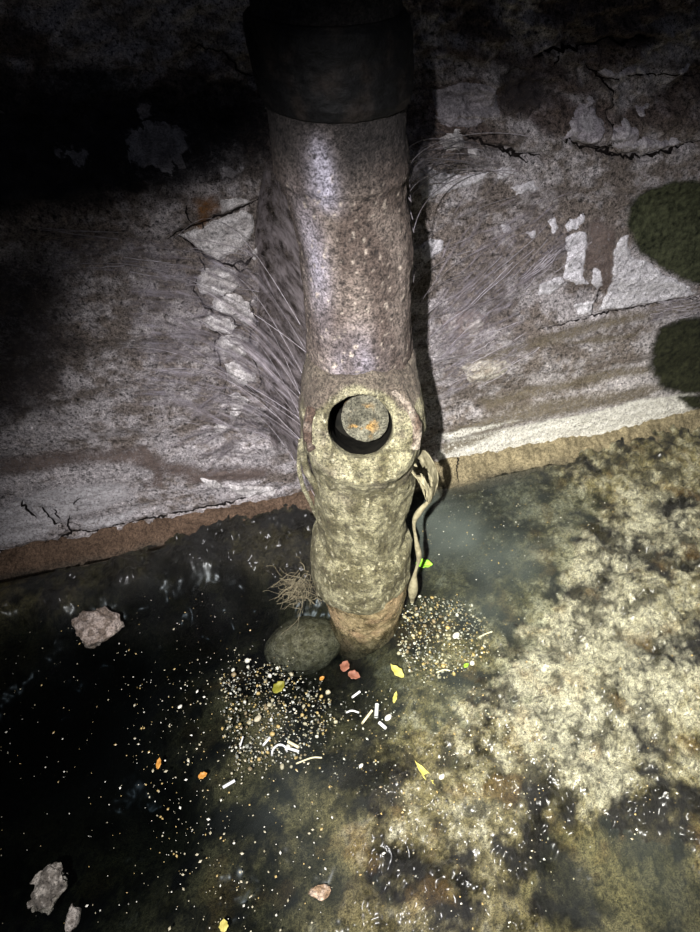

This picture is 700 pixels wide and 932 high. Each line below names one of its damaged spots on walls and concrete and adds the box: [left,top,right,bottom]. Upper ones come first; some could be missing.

crack [459,133,541,163]
crack [533,35,700,160]
crack [167,199,269,393]
spalling [179,197,257,434]
peeling [538,213,695,315]
crack [21,497,246,543]